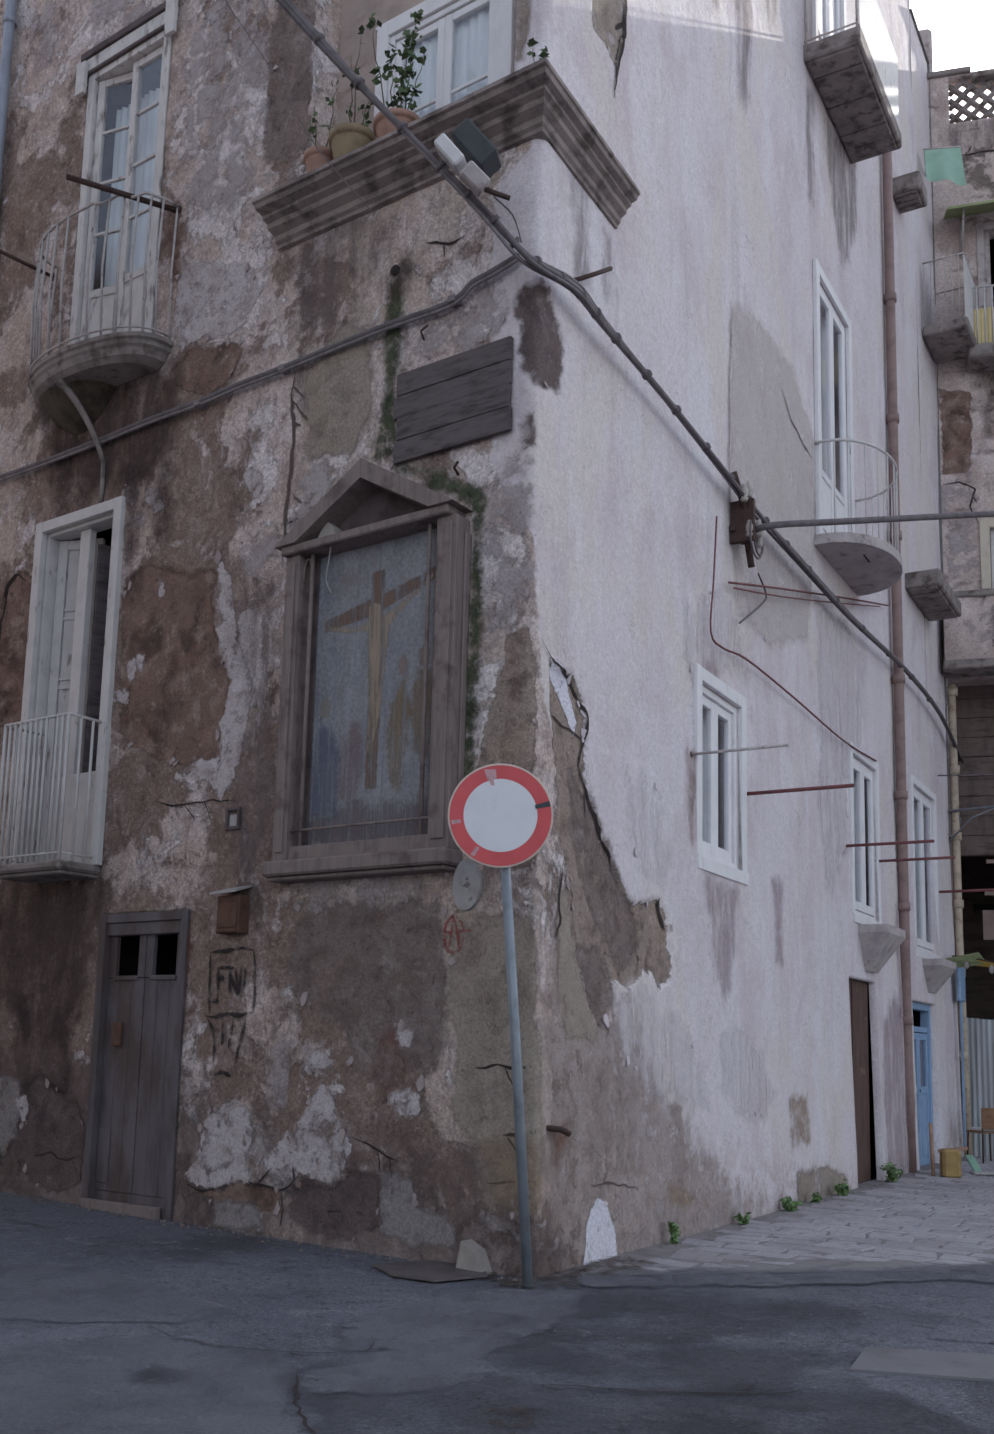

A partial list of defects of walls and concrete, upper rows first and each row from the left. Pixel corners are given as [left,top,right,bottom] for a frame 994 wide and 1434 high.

flaking render [592,0,623,66]
flaking render [401,277,563,391]
crack [282,370,312,557]
flaking render [938,389,979,577]
flaking render [114,549,255,801]
flaking render [471,415,674,1043]
flaking render [14,1071,84,1193]
flaking render [185,1035,381,1241]